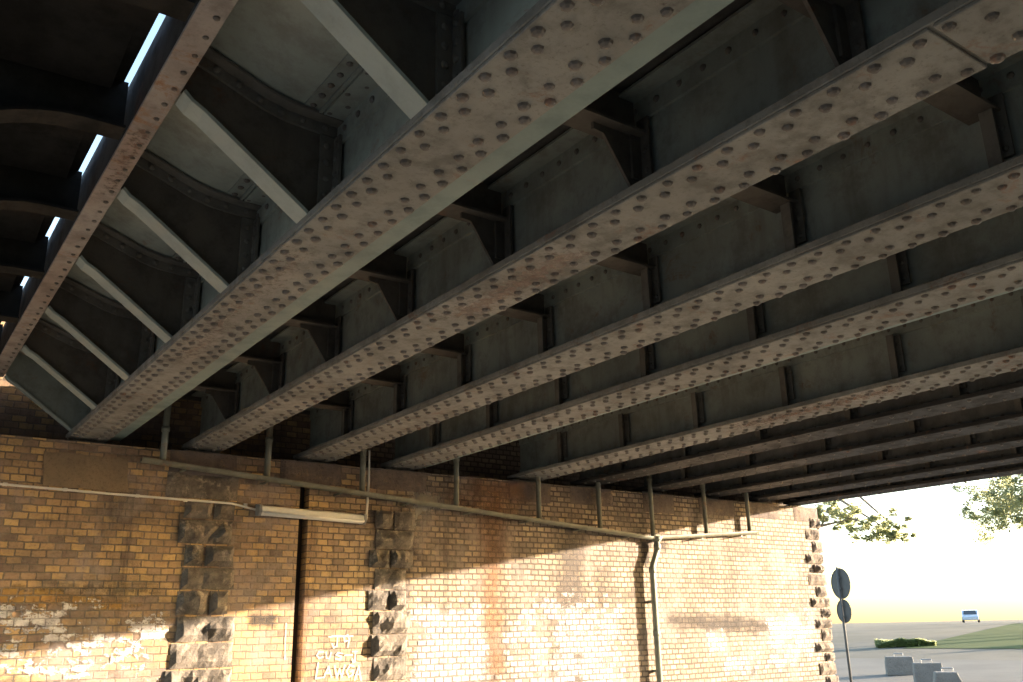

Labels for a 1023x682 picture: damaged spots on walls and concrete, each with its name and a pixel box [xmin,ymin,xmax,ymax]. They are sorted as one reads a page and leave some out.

leakage [558,528,583,682]